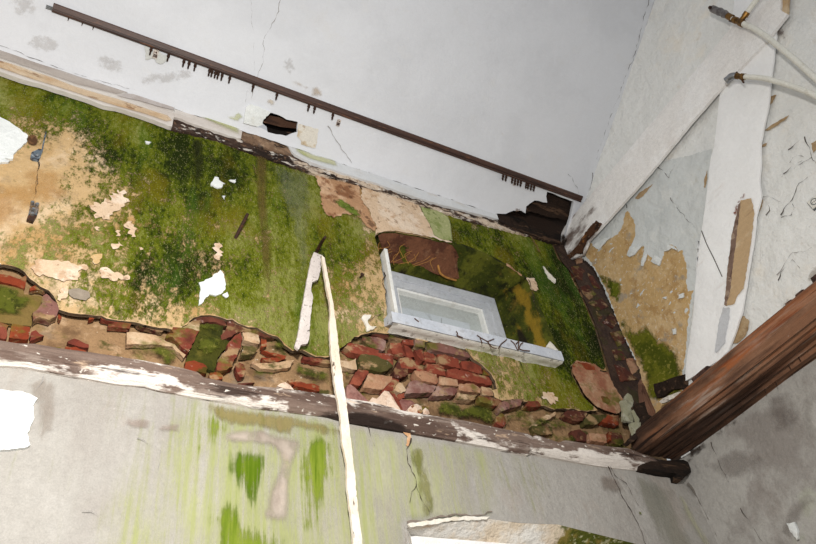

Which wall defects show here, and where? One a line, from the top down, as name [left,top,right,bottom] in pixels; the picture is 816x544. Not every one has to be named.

peeling [0,117,28,164]
spalling [117,94,174,110]
spalling [241,104,292,156]
spalling [297,124,319,148]
flaking render [0,254,130,344]
peeling [87,149,712,447]
flaking render [56,339,89,352]
peeling [0,389,38,452]
leakage [228,431,297,518]
crack [608,466,646,544]